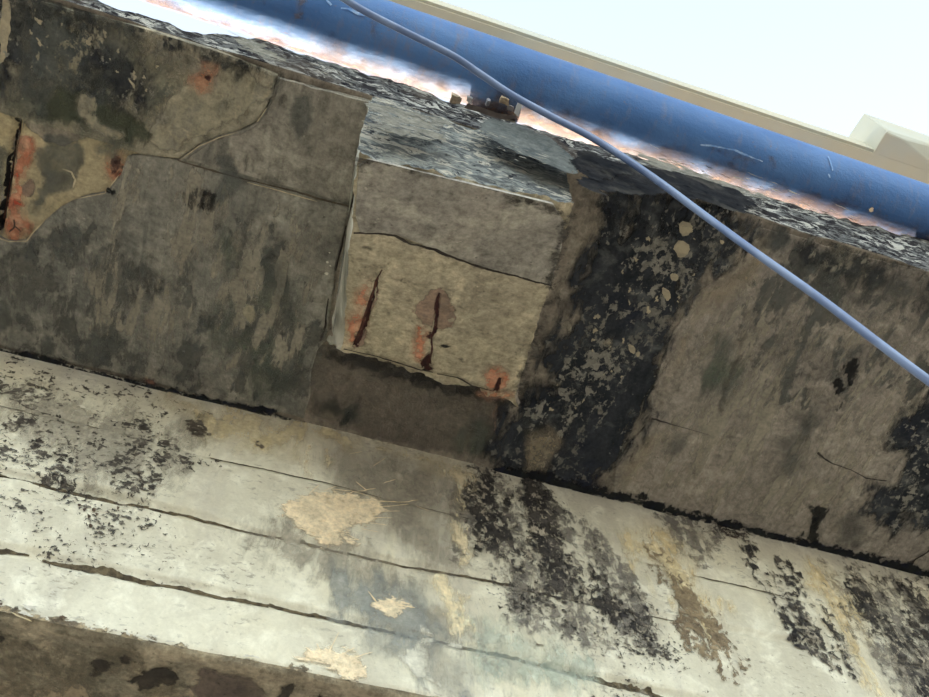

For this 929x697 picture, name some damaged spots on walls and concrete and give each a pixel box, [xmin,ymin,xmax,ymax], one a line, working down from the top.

leakage [193,44,260,81]
peeling [77,94,123,139]
spalling [0,117,35,240]
crack [177,132,552,286]
leakage [0,143,929,697]
rust [485,368,509,431]
crack [651,418,708,435]
crack [817,452,886,481]
spalling [0,598,188,649]
spalling [276,663,358,682]